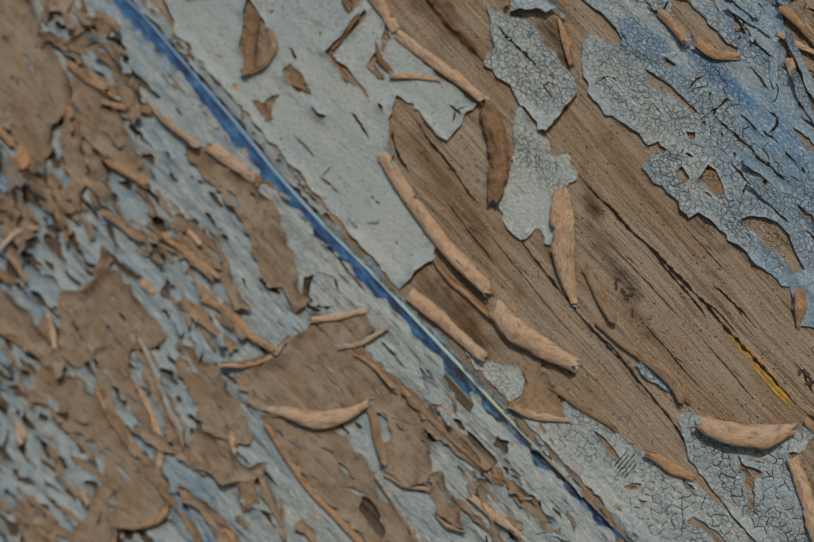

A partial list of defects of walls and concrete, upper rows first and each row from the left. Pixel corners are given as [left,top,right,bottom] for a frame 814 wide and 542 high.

crack [497,25,552,98]
crack [736,19,759,47]
peeling [484,0,814,328]
crack [731,163,751,188]
crack [710,98,790,183]
crack [769,84,779,133]
peeling [0,0,625,542]
crack [579,175,806,413]
peeling [301,189,814,542]
crack [795,363,814,392]
crack [613,449,638,478]